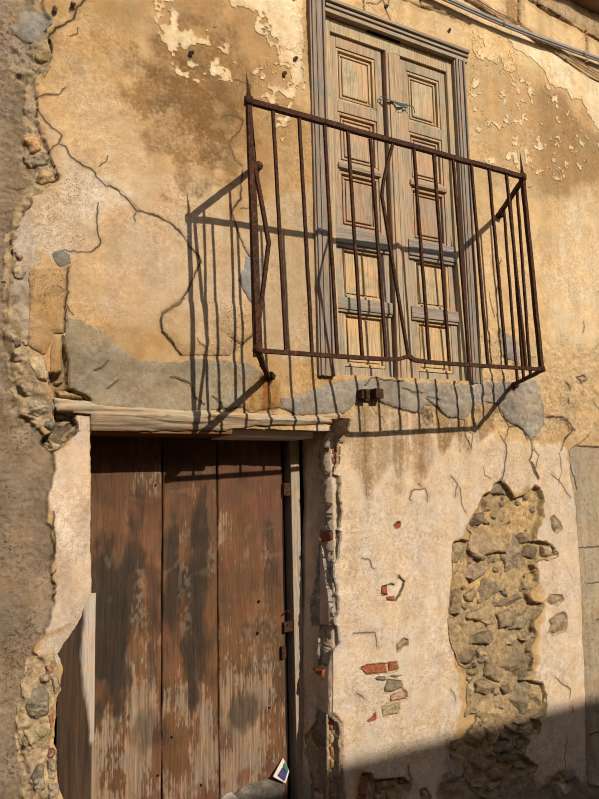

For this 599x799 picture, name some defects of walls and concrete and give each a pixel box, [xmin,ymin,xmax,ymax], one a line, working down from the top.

crack [38,0,85,75]
crack [34,87,202,355]
peeling [154,0,236,83]
crack [220,79,259,256]
peeling [229,0,306,142]
peeling [467,24,599,190]
crack [170,376,295,415]
crack [361,377,473,496]
crack [483,382,590,497]
flaking render [309,418,351,678]
flaking render [359,637,409,722]
flaking render [447,478,571,799]